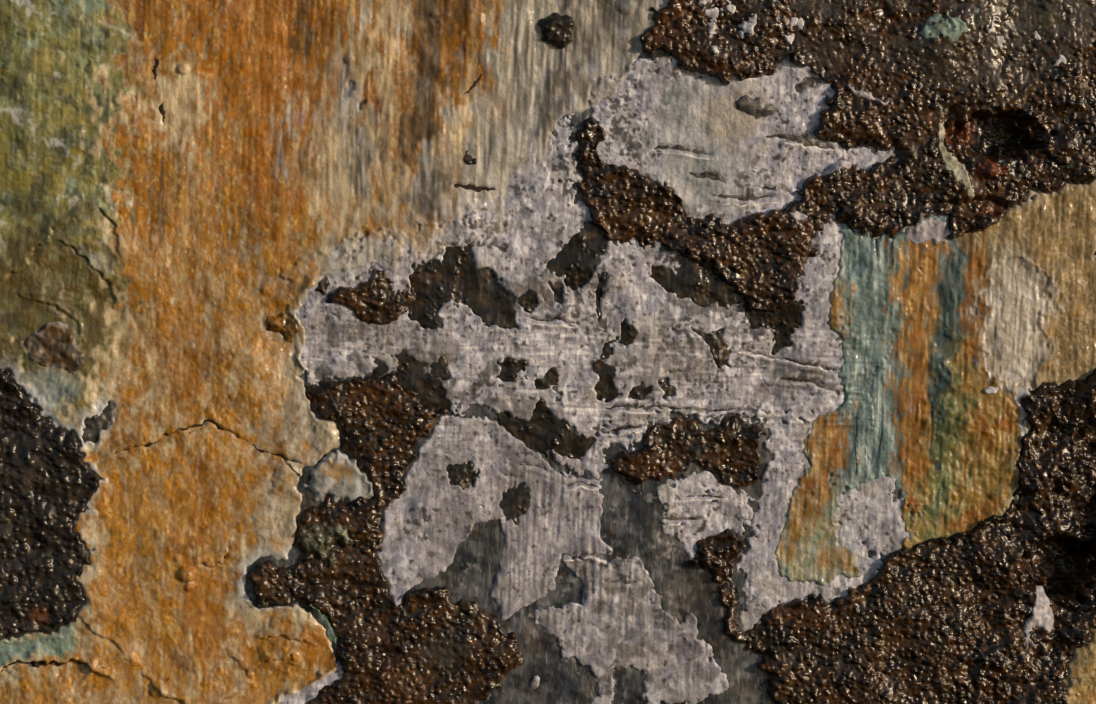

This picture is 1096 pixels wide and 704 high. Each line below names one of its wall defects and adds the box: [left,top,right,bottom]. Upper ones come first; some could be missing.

peeling [699,0,757,56]
peeling [784,17,804,44]
peeling [590,56,899,227]
rust [0,0,525,704]
rust [571,0,1096,704]
peeling [295,113,950,704]
peeling [1014,386,1032,440]
crack [97,419,305,477]
crack [1,659,99,673]
crack [86,624,183,704]
peeling [278,661,344,704]